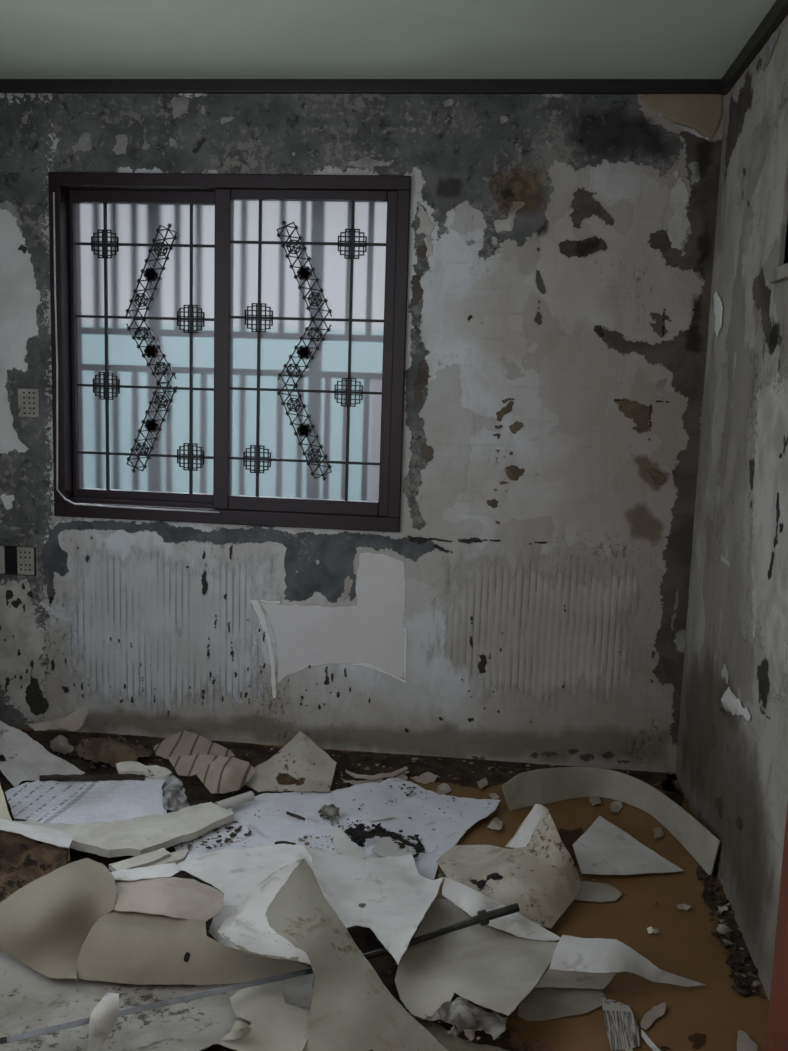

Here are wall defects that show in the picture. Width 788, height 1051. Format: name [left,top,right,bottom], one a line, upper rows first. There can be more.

water stain [0,578,89,724]
peeling [0,27,779,745]
water stain [747,268,788,713]